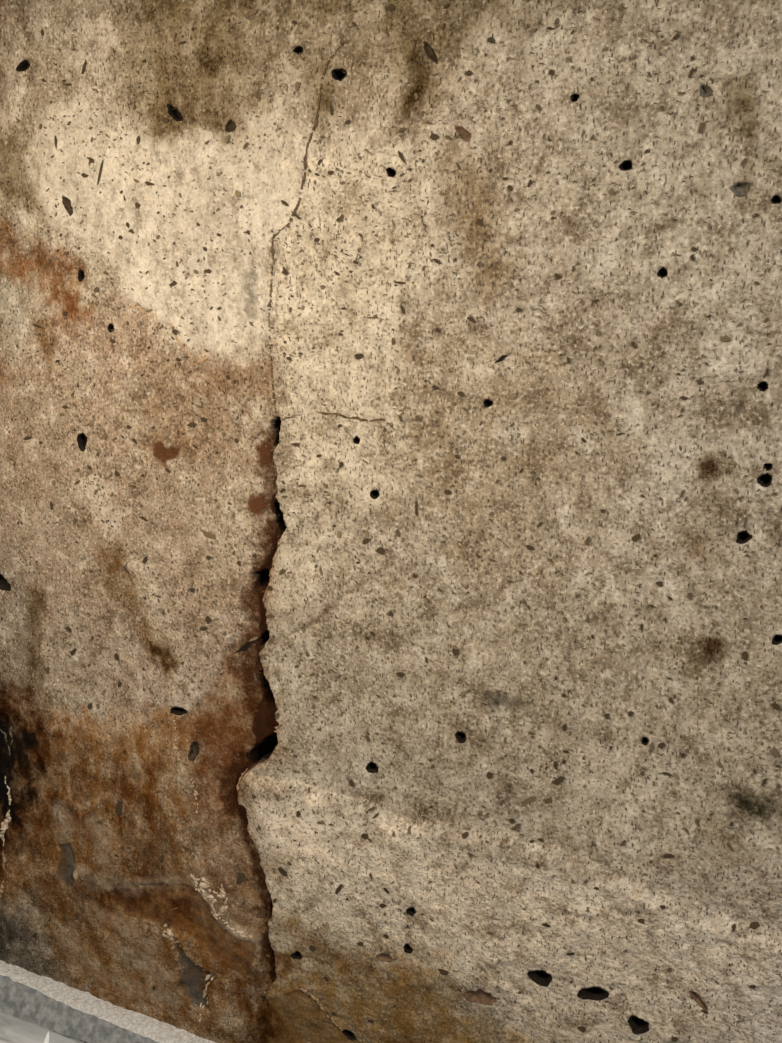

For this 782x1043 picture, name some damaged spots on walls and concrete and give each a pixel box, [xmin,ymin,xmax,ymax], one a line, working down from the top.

crack [268,39,396,447]
crack [235,493,287,825]
rust [244,519,286,722]
damp [0,696,44,852]
rust [223,753,271,909]
spalling [108,874,256,1023]
crack [268,903,277,983]